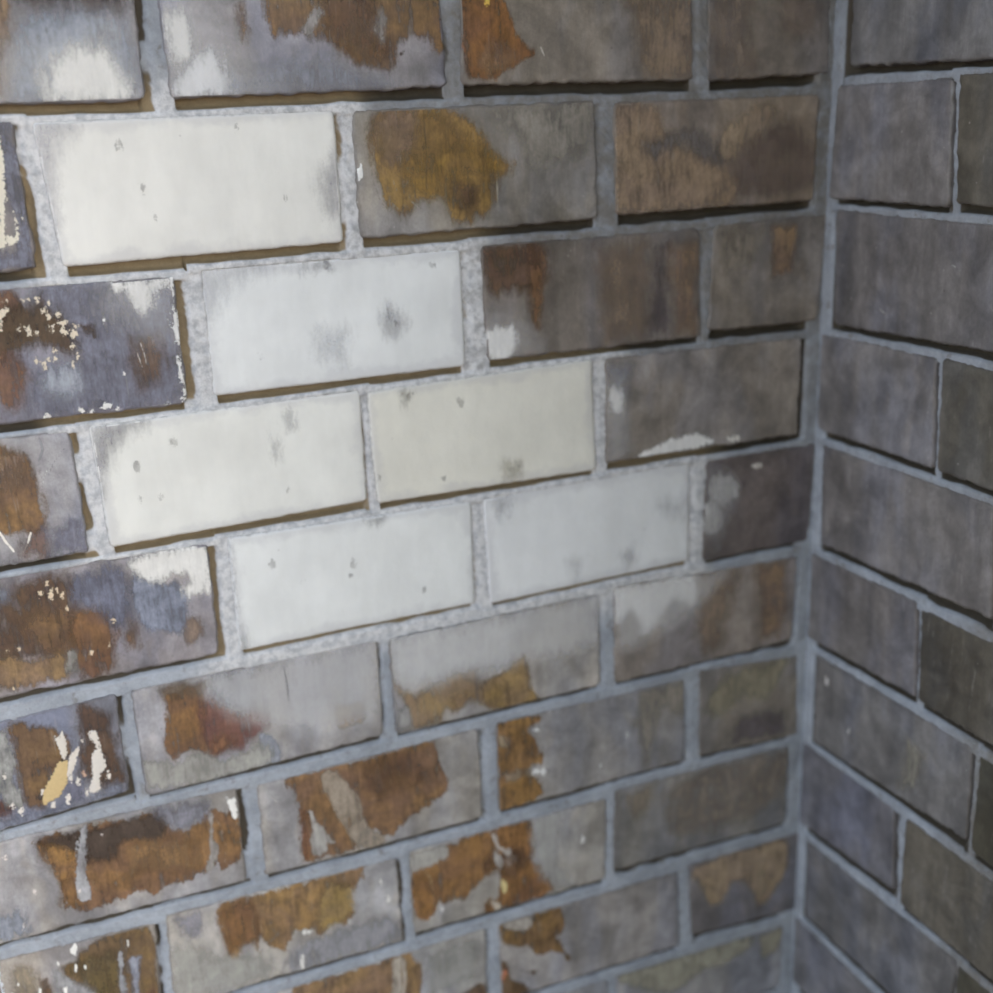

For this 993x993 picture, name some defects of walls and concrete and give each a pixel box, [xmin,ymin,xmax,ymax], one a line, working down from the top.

peeling [0,137,23,249]
peeling [17,297,80,369]
peeling [77,402,120,413]
peeling [38,580,69,611]
peeling [41,730,112,808]
peeling [284,742,449,862]
peeling [32,808,242,912]
peeling [409,813,568,922]
peeling [172,866,402,993]
peeling [292,941,487,993]
peeling [501,962,536,993]
peeling [500,907,570,962]